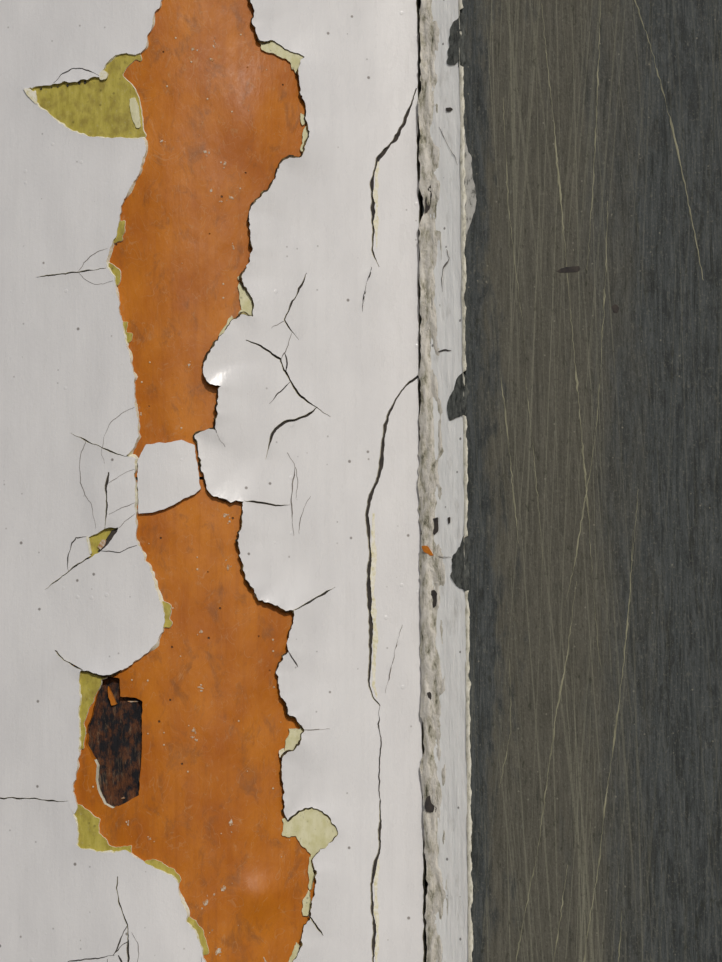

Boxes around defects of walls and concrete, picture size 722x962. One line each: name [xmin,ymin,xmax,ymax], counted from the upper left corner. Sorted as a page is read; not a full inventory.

peeling [447,13,467,67]
crack [41,249,111,285]
crack [362,88,417,312]
crack [52,408,137,584]
peeling [24,0,338,962]
crack [246,276,325,533]
peeling [447,373,469,421]
peeling [450,535,470,591]
crack [366,376,419,962]
crack [68,881,139,962]